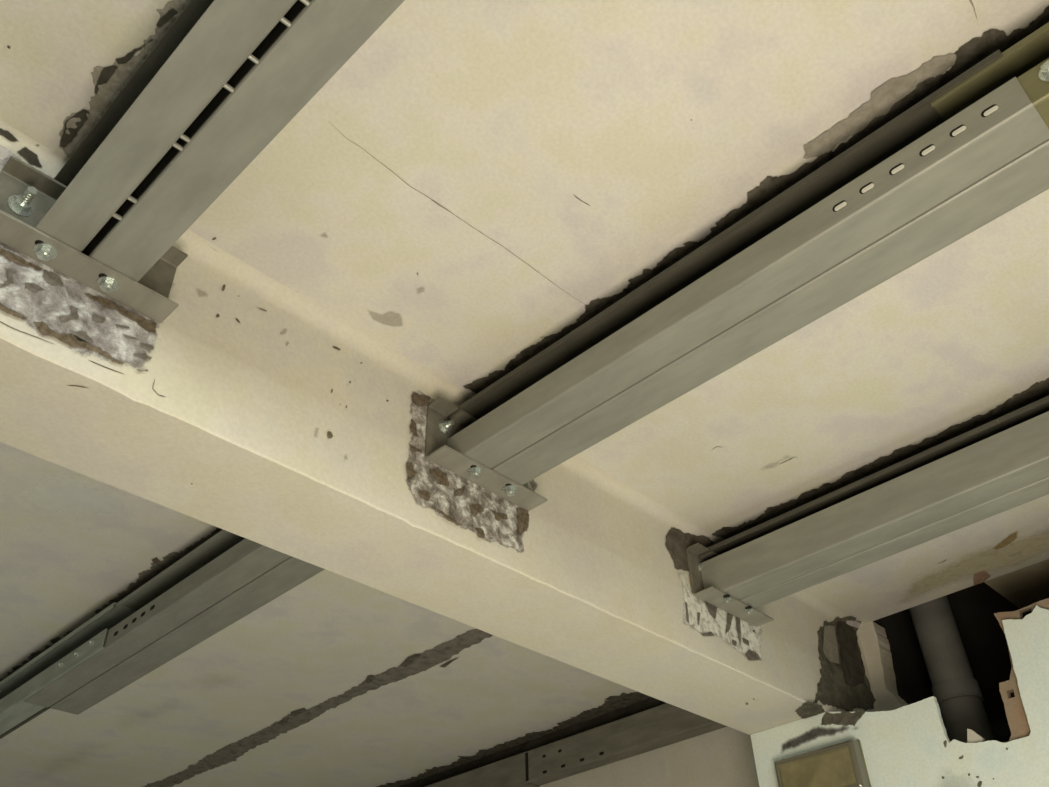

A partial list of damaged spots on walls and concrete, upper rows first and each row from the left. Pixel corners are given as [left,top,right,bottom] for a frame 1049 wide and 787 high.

spalling [59,0,191,158]
spalling [0,128,42,167]
crack [328,121,581,302]
spalling [796,616,876,726]
spalling [377,692,651,787]